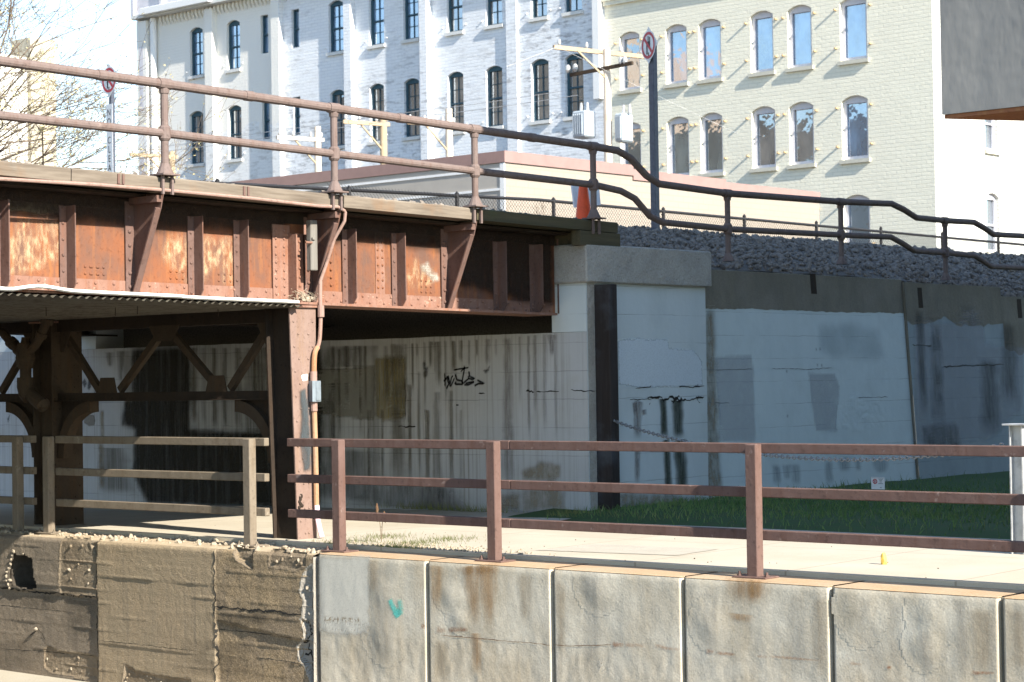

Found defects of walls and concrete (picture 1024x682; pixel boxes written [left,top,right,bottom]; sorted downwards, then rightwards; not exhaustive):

rust [10,223,59,272]
rust [203,242,233,273]
damp [365,344,413,462]
damp [660,399,686,485]
hole [5,549,37,590]
crack [1,551,314,681]
spalling [267,547,317,682]